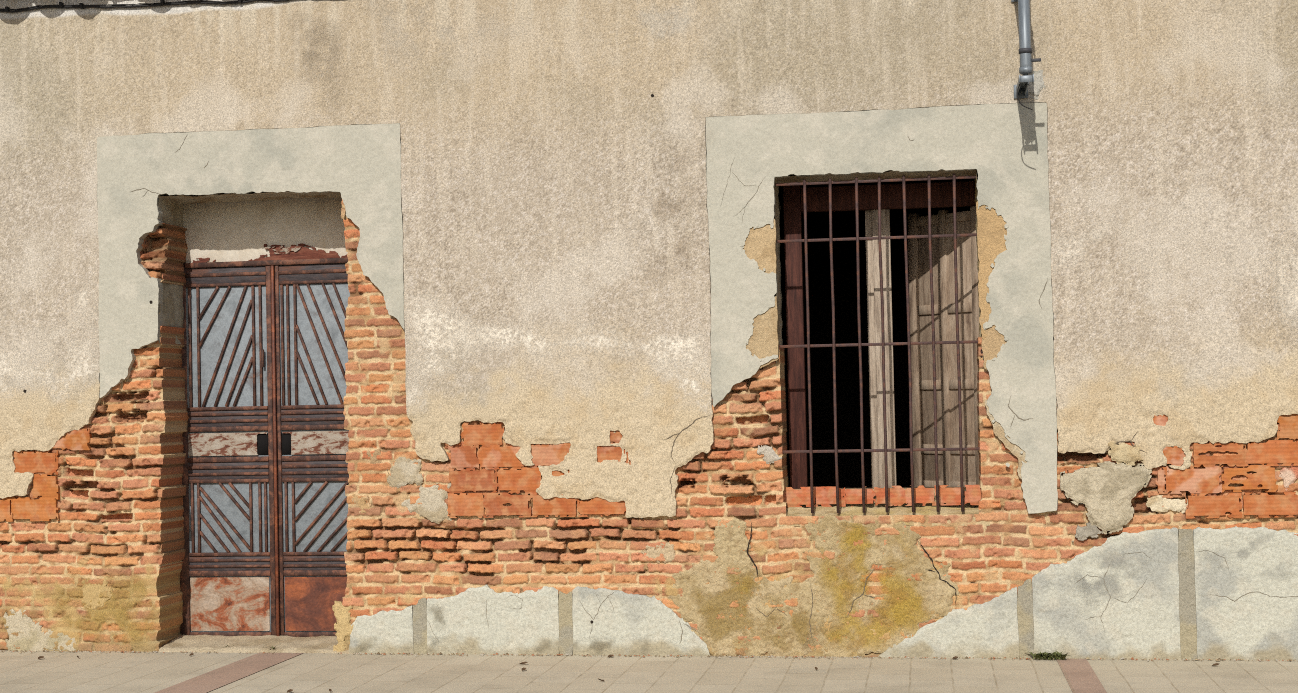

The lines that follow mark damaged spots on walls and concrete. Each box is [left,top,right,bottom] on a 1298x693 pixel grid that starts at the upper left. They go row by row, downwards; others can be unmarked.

spalling [140,223,216,286]
spalling [0,326,189,652]
spalling [332,200,1298,657]